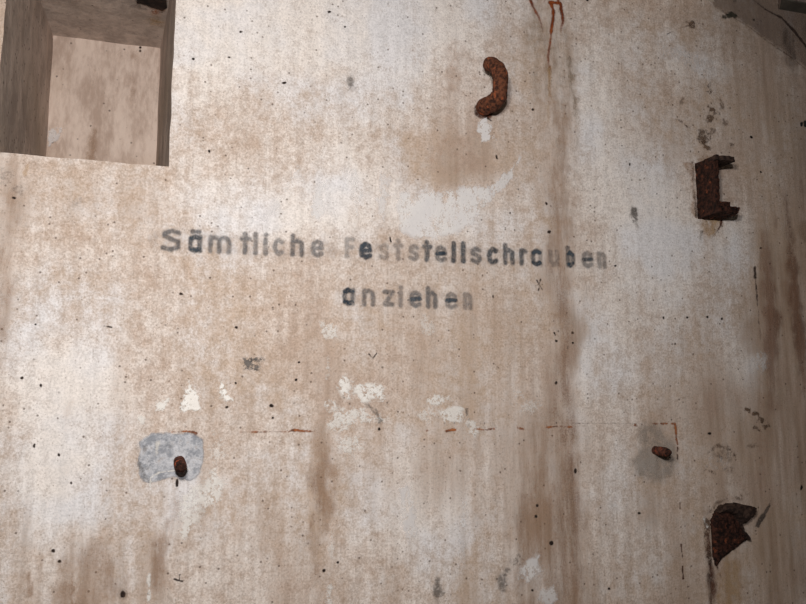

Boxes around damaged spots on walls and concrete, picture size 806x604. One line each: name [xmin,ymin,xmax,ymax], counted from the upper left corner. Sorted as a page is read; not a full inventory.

rust [548,0,564,75]